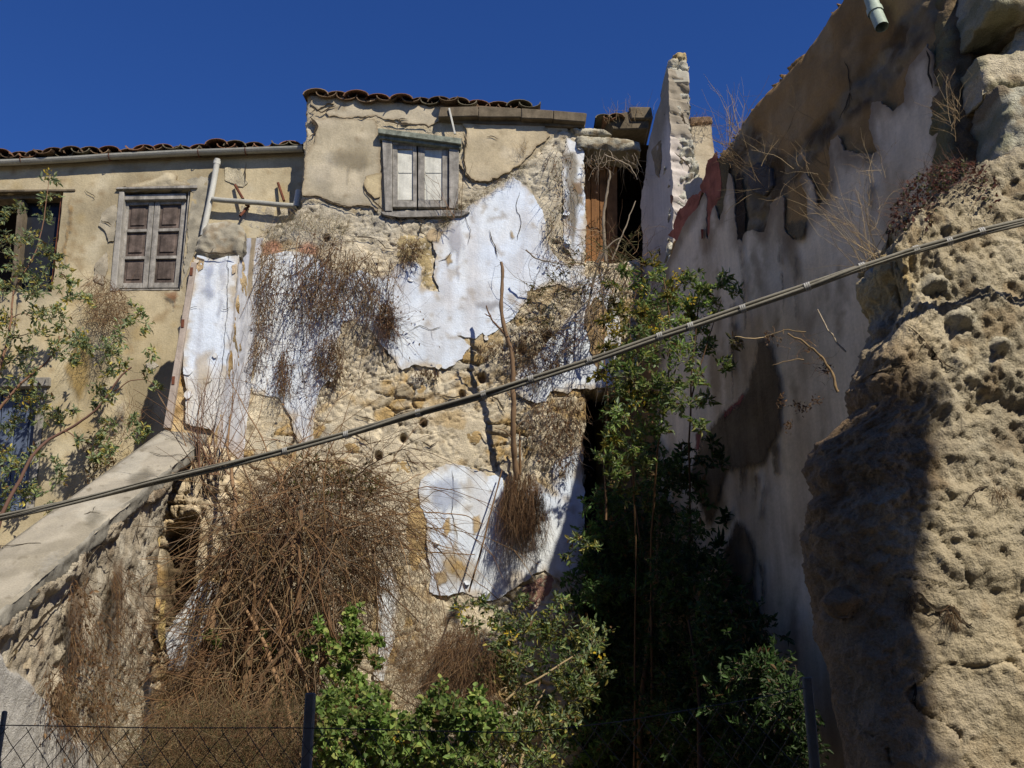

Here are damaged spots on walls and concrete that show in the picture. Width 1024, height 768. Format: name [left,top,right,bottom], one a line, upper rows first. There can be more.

spalling [225,167,248,187]
spalling [239,206,295,231]
spalling [668,152,746,241]
peeling [182,176,240,429]
flaking render [251,138,621,443]
spalling [467,431,483,446]
flaking render [406,446,585,611]